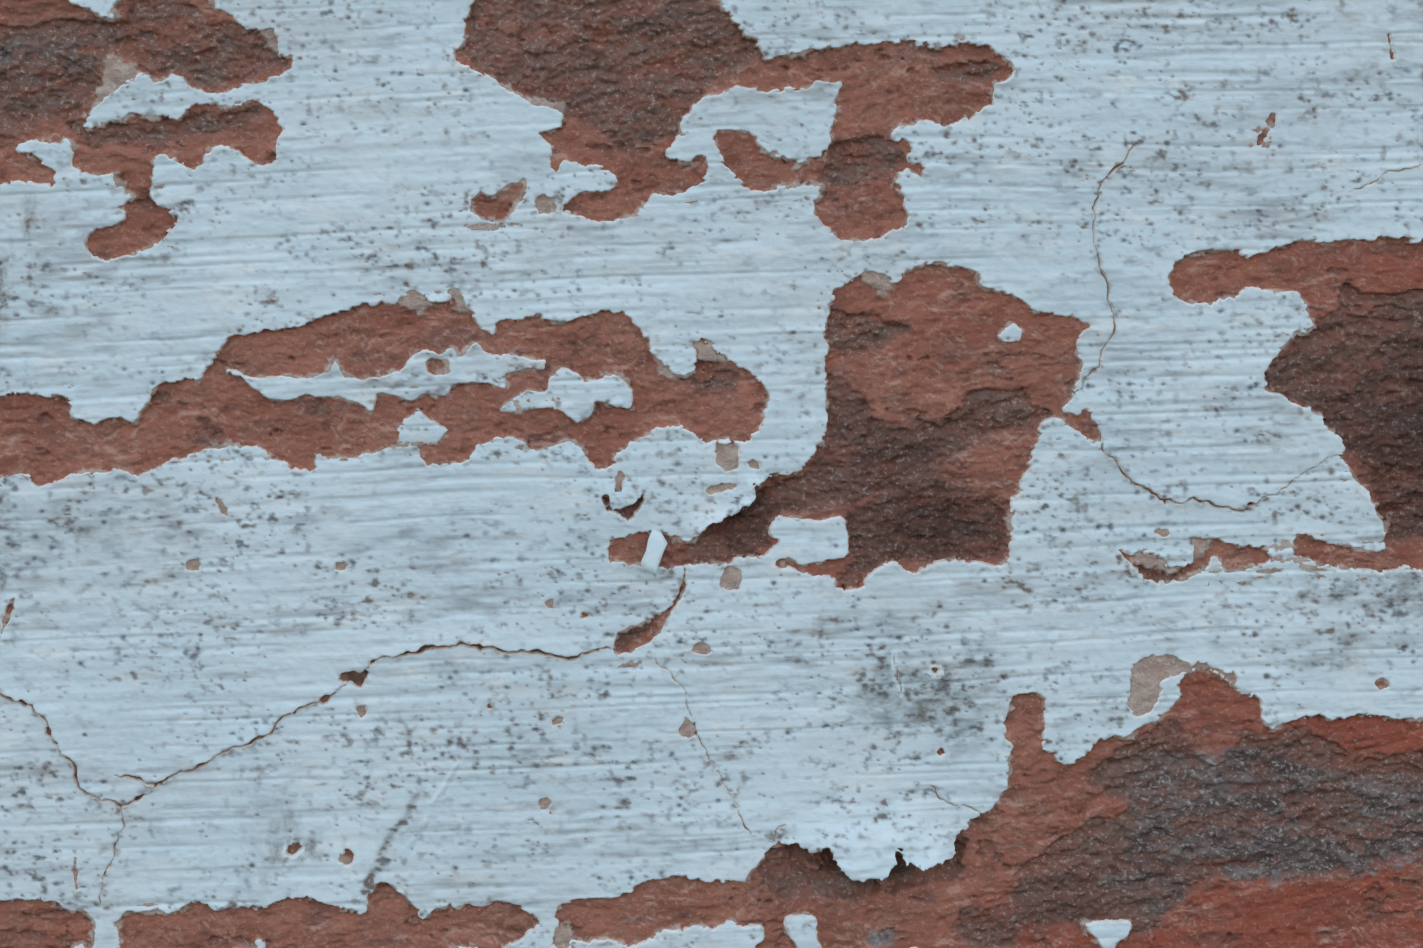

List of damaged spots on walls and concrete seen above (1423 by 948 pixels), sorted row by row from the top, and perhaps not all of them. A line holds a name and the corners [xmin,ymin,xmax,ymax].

peeling [0,0,293,261]
peeling [454,0,1013,242]
peeling [1248,109,1281,149]
peeling [0,258,1101,668]
crack [1101,447,1253,511]
peeling [1119,236,1423,586]
crack [6,642,615,807]
peeling [114,654,1423,948]
peeling [0,897,96,948]